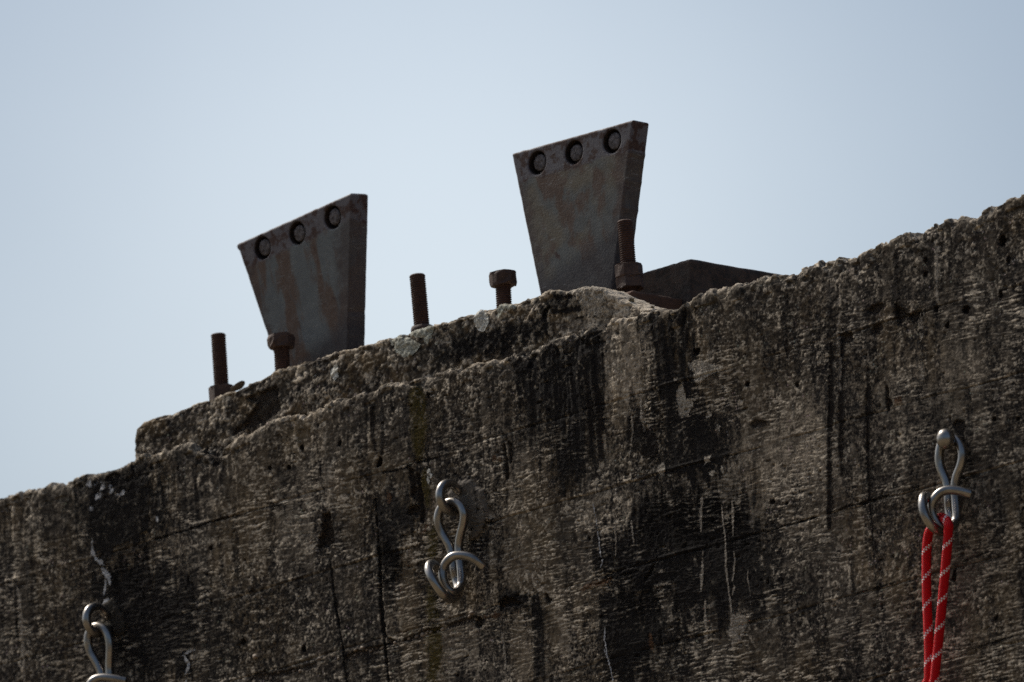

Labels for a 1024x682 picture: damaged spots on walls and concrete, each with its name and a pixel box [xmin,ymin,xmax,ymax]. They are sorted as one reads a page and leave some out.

leakage [447,293,609,497]
leakage [589,303,782,682]
leakage [826,283,844,530]
leakage [865,367,875,558]
leakage [498,589,548,682]